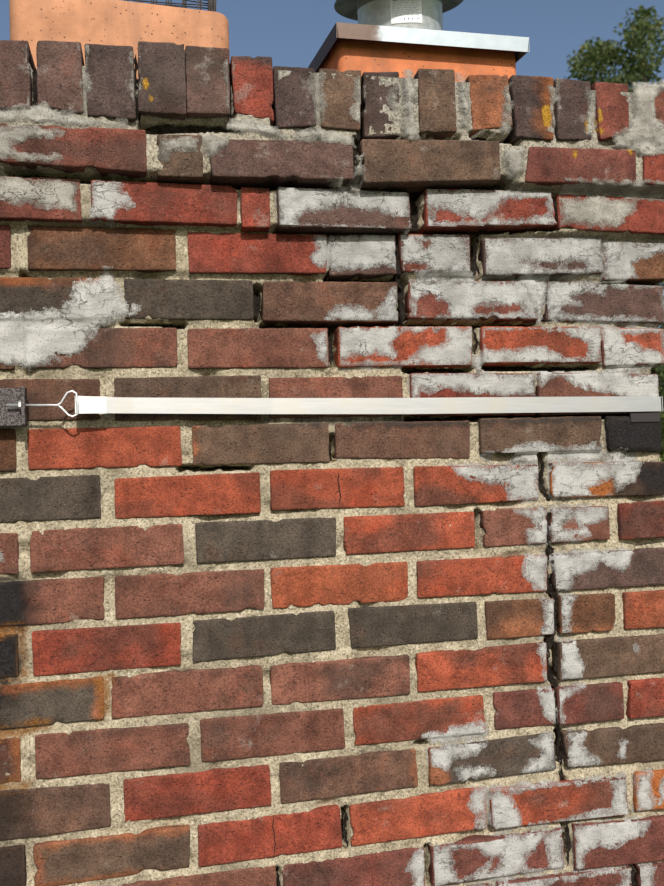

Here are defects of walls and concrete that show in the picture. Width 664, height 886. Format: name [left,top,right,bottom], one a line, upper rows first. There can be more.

crack [538,452,565,781]
crack [272,815,281,886]
crack [341,811,349,847]
crack [564,821,572,866]
crack [629,867,637,886]